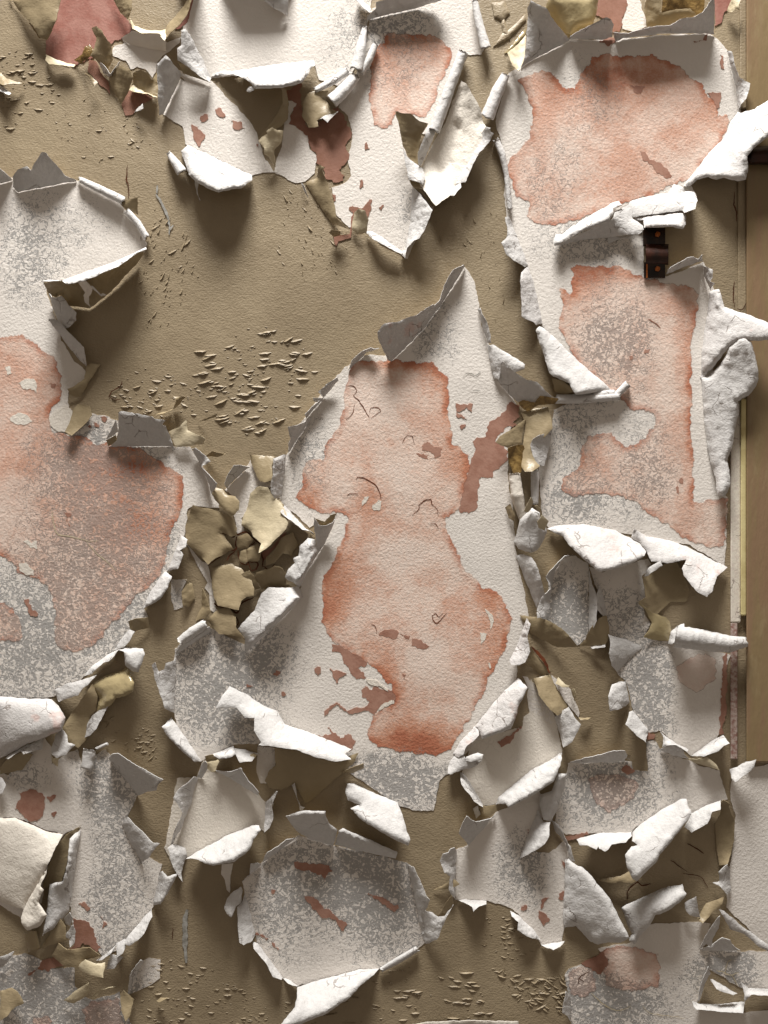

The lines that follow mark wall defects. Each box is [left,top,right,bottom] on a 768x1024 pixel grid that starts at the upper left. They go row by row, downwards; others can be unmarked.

damp [369,32,452,128]
damp [508,53,730,226]
peeling [641,151,672,179]
damp [559,265,729,548]
damp [0,334,184,652]
damp [296,359,512,756]
peeling [224,798,454,1024]
peeling [597,871,636,883]
peeling [685,897,700,917]
peeling [438,972,484,1005]
peeling [418,1012,519,1024]
peeling [710,979,737,995]